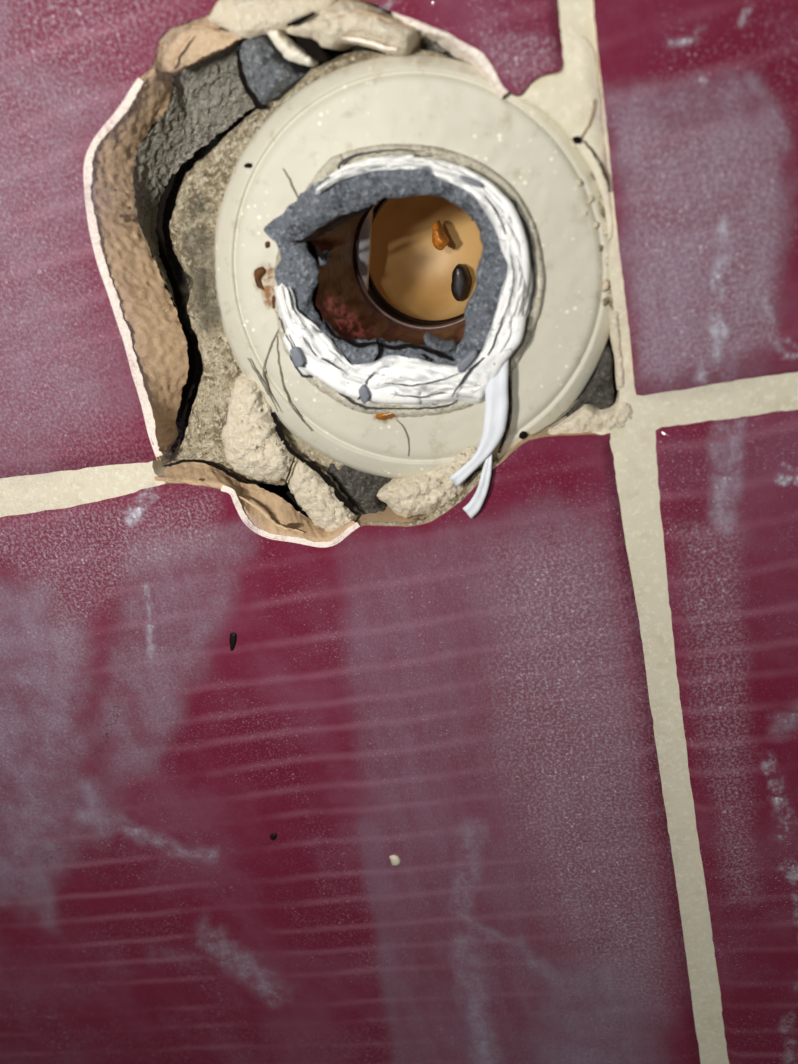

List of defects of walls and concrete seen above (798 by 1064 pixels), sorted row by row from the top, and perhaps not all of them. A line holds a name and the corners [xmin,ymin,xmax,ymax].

peeling [587,195,605,229]
spalling [83,11,508,548]
peeling [601,278,610,306]